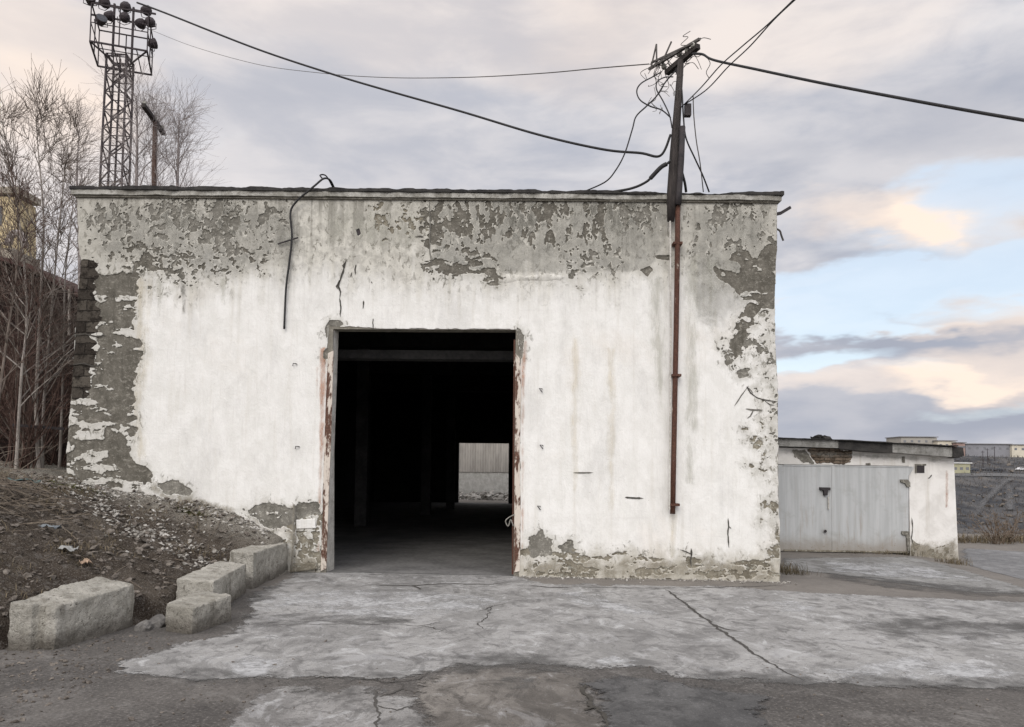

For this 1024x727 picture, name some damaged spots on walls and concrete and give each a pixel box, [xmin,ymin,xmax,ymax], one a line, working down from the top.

crack [336,261,374,326]
peeling [366,201,663,289]
peeling [640,255,670,277]
peeling [66,198,289,496]
peeling [687,203,778,479]
spalling [792,448,852,465]
peeling [243,500,323,572]
spalling [520,529,780,581]
spalling [760,500,779,523]
crack [665,549,801,679]